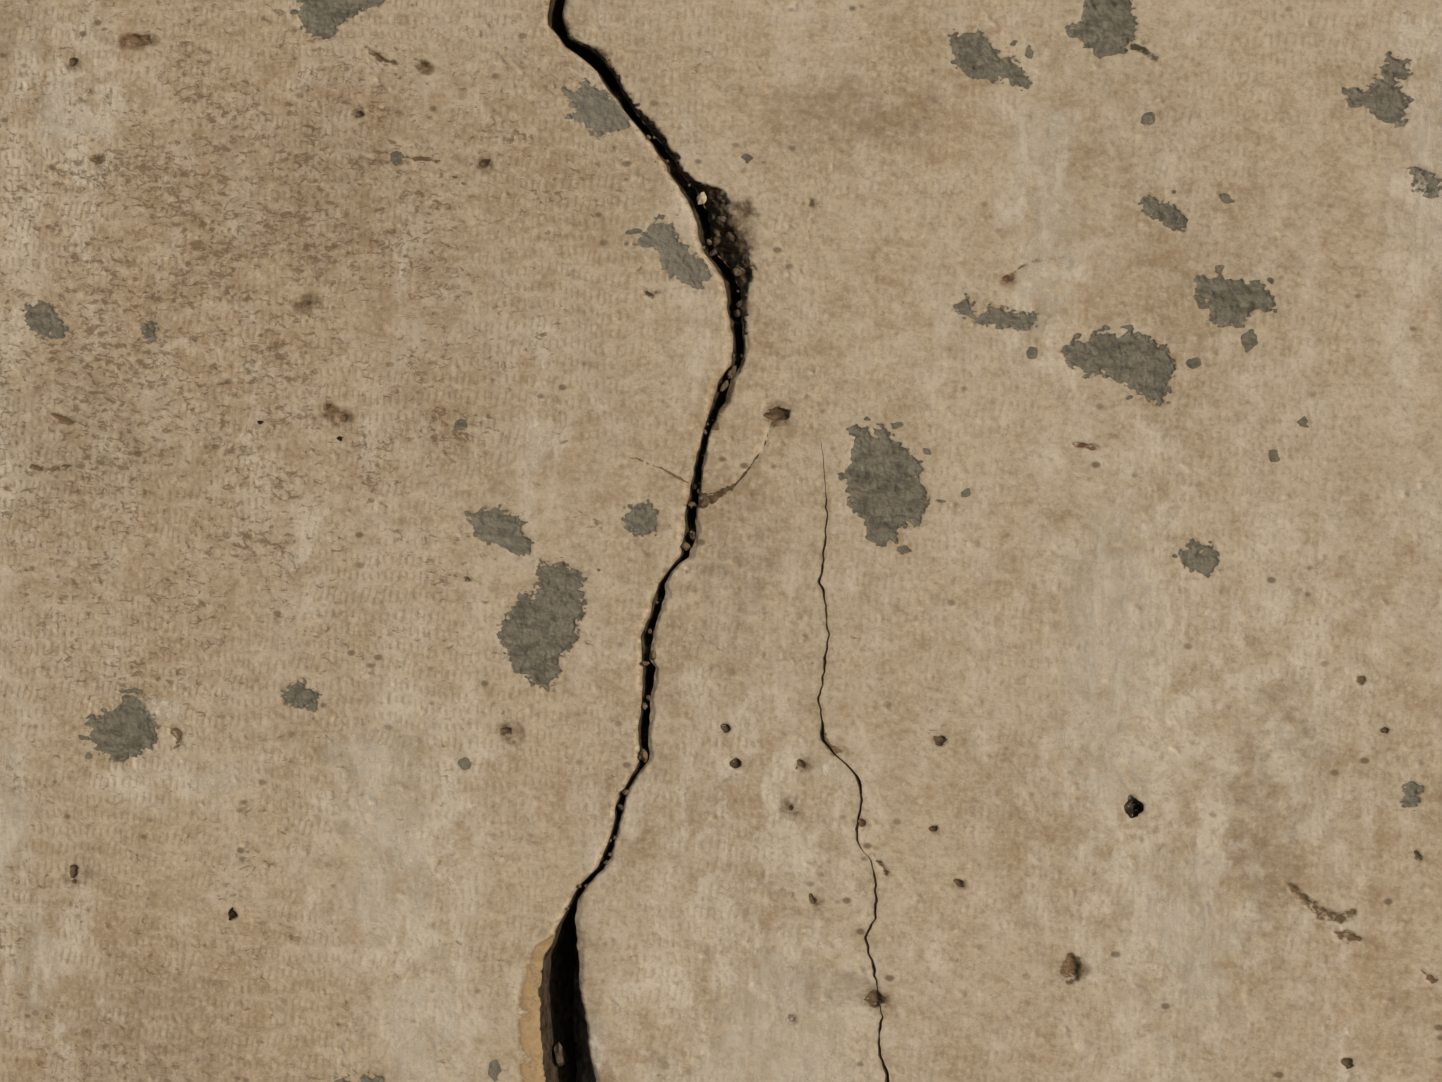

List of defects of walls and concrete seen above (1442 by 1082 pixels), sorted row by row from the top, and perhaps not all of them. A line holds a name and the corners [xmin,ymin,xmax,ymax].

peeling [290,0,385,40]
peeling [947,28,1034,91]
peeling [1065,0,1158,60]
peeling [1341,51,1414,128]
peeling [624,214,712,298]
peeling [1193,265,1277,352]
peeling [1060,324,1201,407]
peeling [837,416,946,555]
crack [518,0,773,1082]
peeling [465,504,601,692]
peeling [78,687,183,763]
crack [817,439,890,1082]